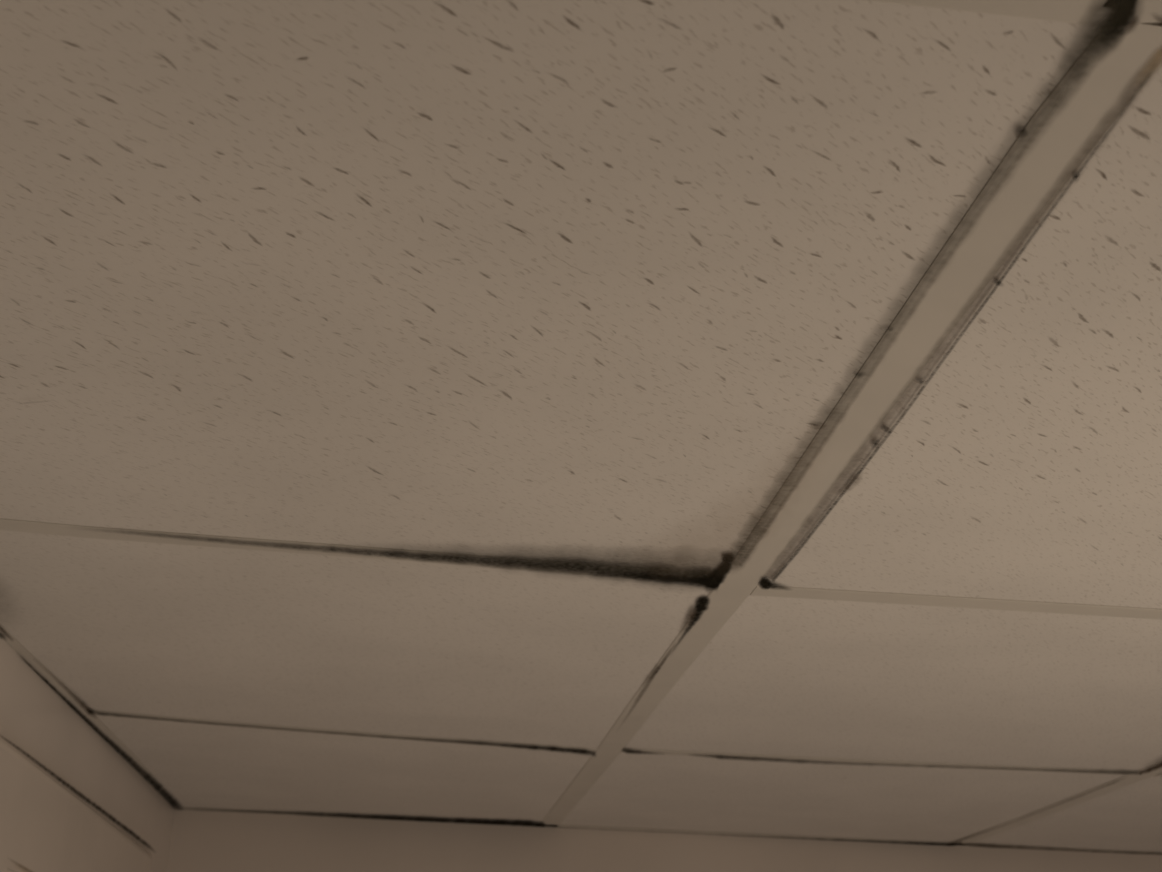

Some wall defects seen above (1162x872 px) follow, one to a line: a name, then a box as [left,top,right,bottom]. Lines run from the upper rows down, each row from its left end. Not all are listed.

water stain [1081,0,1137,52]
water stain [280,525,761,638]
water stain [759,578,785,589]